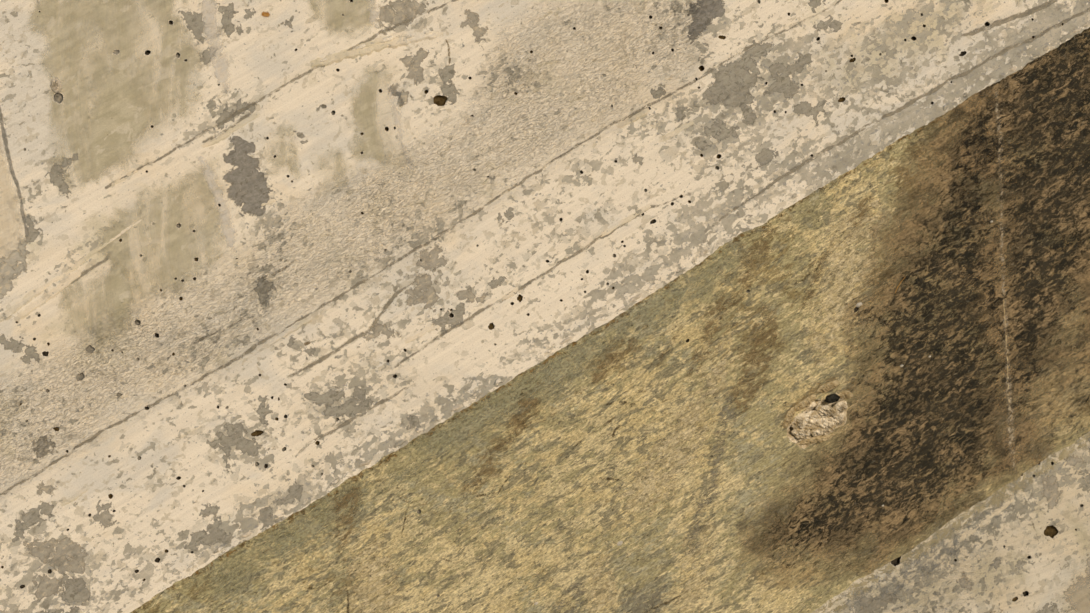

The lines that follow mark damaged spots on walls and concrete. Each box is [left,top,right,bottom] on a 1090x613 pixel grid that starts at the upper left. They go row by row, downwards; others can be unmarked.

crack [347,0,456,51]
peeling [683,0,725,44]
peeling [695,40,830,151]
peeling [206,98,275,216]
peeling [755,144,779,167]
crack [1,25,796,495]
water stain [804,197,888,369]
water stain [1000,192,1015,468]
spalling [781,377,854,449]
peeling [12,483,91,613]